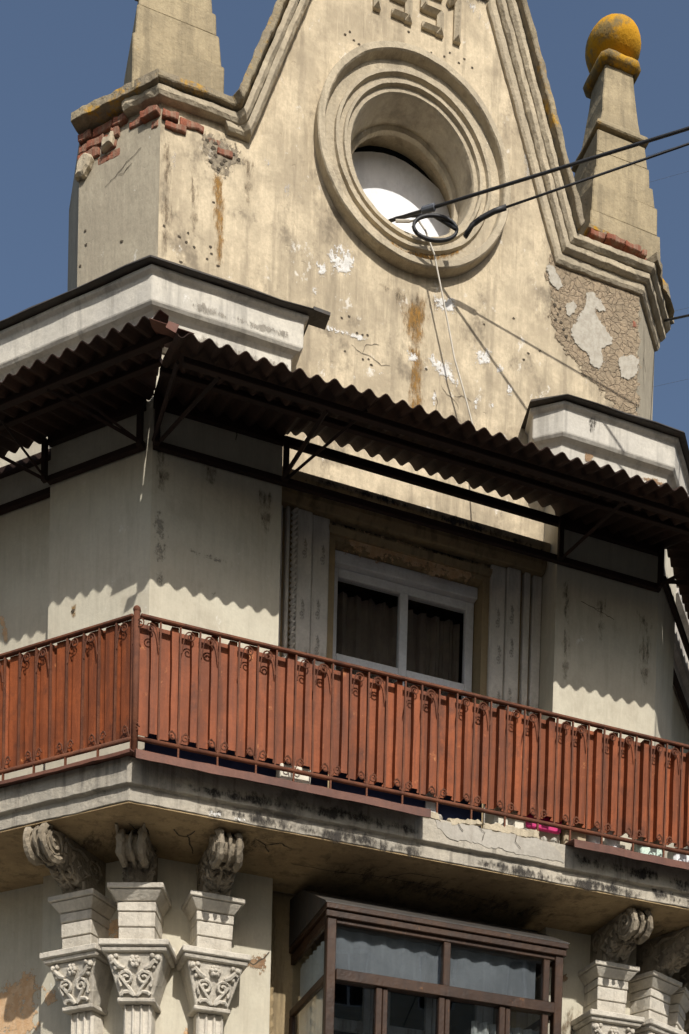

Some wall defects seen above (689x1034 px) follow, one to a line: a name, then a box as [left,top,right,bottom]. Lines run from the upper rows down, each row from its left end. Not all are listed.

flaking render [75,105,245,182]
flaking render [583,223,647,260]
flaking render [544,251,641,416]
water stain [189,785,419,856]
spalling [422,812,564,863]
flaking render [0,969,57,1034]